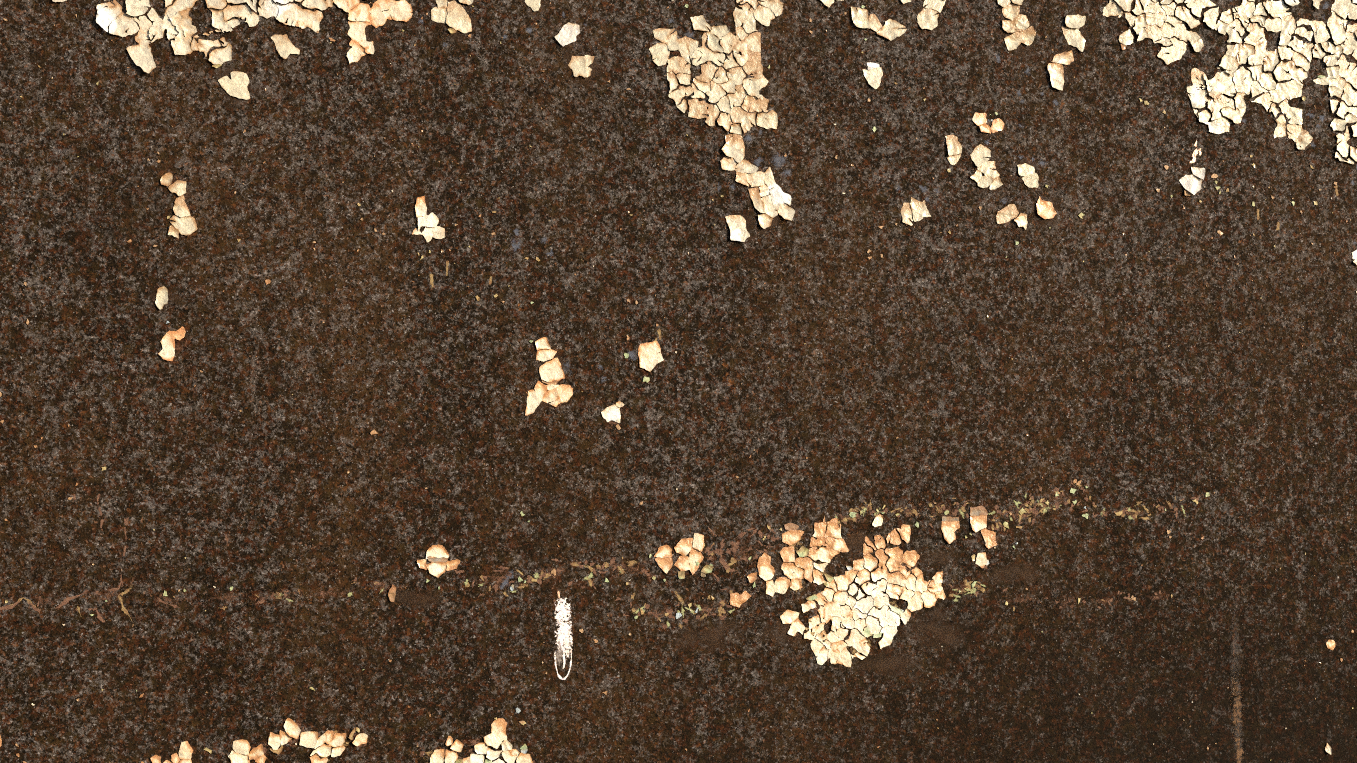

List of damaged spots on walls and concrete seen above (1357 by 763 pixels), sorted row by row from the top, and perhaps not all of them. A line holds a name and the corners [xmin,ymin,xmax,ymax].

peeling [1047,14,1086,91]
peeling [649,0,795,242]
peeling [945,112,1004,191]
peeling [525,337,573,416]
rust [835,498,969,550]
rust [989,481,1199,531]
rust [0,575,134,627]
rust [454,557,656,597]
rust [615,527,788,629]
peeling [730,501,1026,667]
rust [949,578,985,602]
peeling [428,708,533,763]